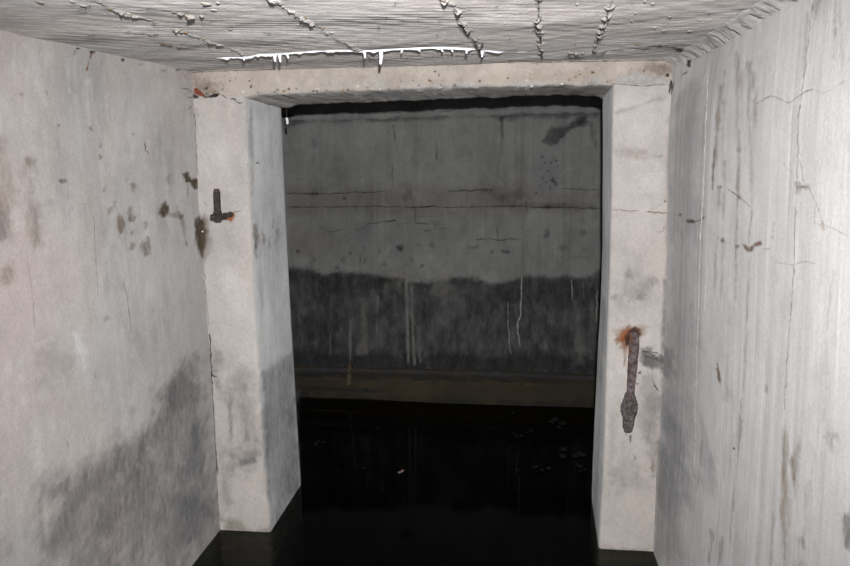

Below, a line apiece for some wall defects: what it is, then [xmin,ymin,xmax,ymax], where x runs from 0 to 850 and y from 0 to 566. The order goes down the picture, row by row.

crack [70,0,274,71]
crack [268,0,376,68]
damp [218,47,503,65]
crack [440,0,486,65]
crack [533,0,684,63]
damp [284,270,601,382]
corrosion [616,327,641,347]